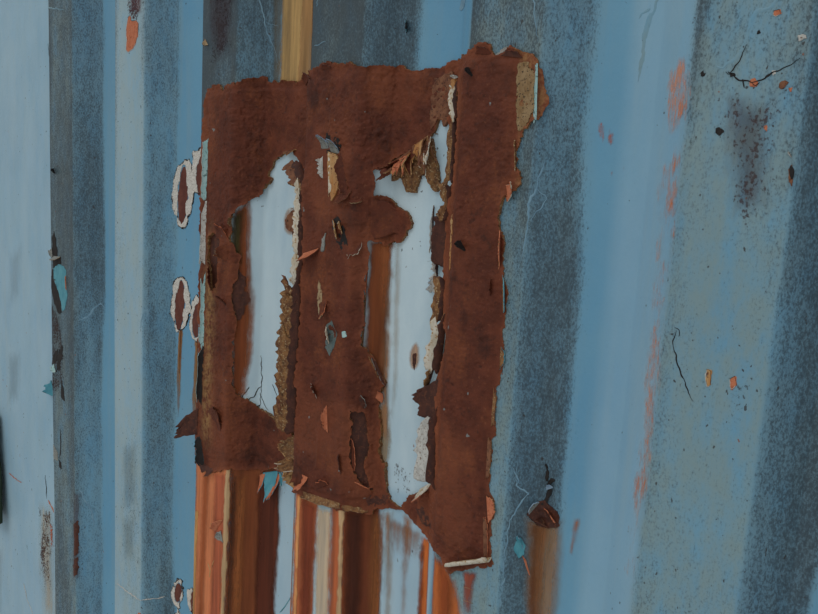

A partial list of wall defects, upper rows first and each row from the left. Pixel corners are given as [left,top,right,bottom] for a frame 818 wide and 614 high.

crack [726,44,798,88]
corrosion [285,207,295,236]
peeling [42,233,68,401]
corrosion [232,206,252,396]
peeling [174,42,549,575]
corrosion [366,242,392,462]
crack [672,327,693,401]
corrosion [175,464,279,614]
corrosion [290,493,317,614]
corrosion [328,508,475,614]
corrosion [532,526,557,614]